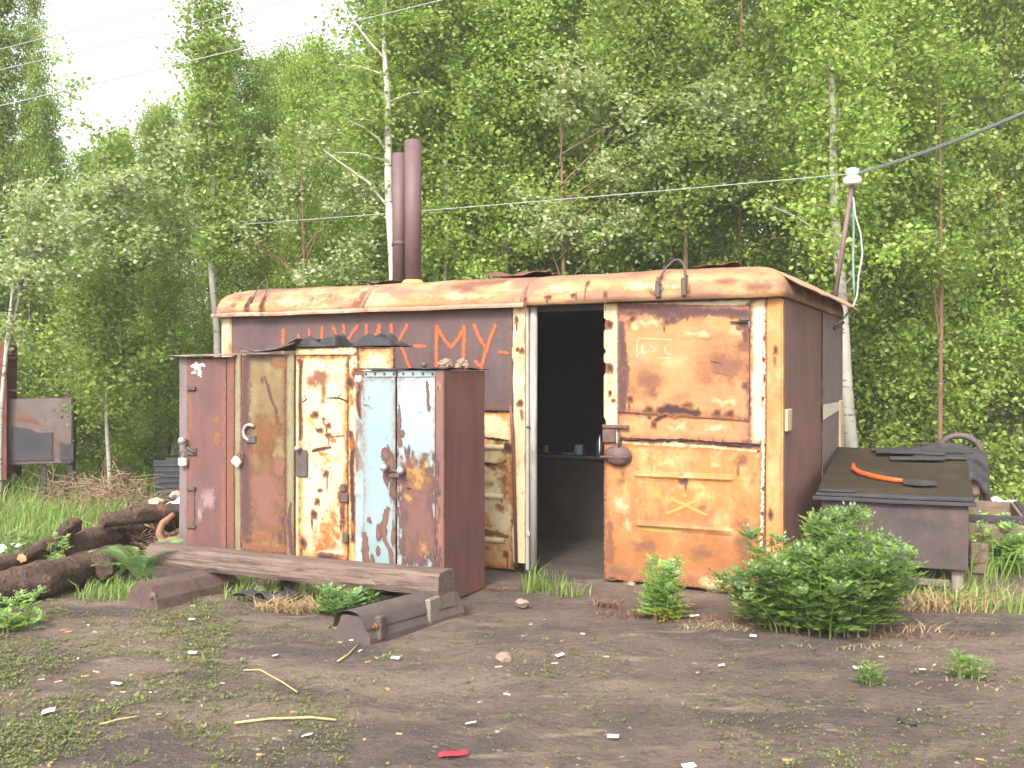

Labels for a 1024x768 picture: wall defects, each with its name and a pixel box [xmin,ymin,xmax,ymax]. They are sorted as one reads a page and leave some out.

corrosion [231,296,267,312]
corrosion [352,290,368,307]
corrosion [603,275,752,428]
corrosion [344,368,363,418]
corrosion [241,358,356,556]
peeling [361,405,442,568]
corrosion [485,440,512,512]
peeling [622,313,767,547]
corrosion [485,529,509,568]
corrosion [605,521,616,563]